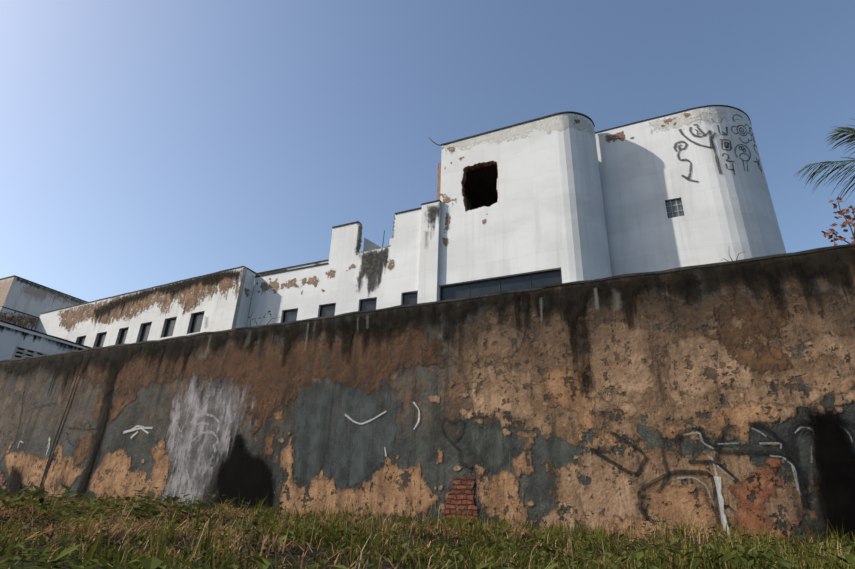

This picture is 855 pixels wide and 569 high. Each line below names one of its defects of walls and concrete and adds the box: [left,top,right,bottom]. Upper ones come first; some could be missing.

flaking render [605,131,634,143]
peeling [57,215,395,332]
damp [425,203,440,240]
damp [0,246,855,513]
peeling [0,284,855,543]
damp [809,408,855,547]